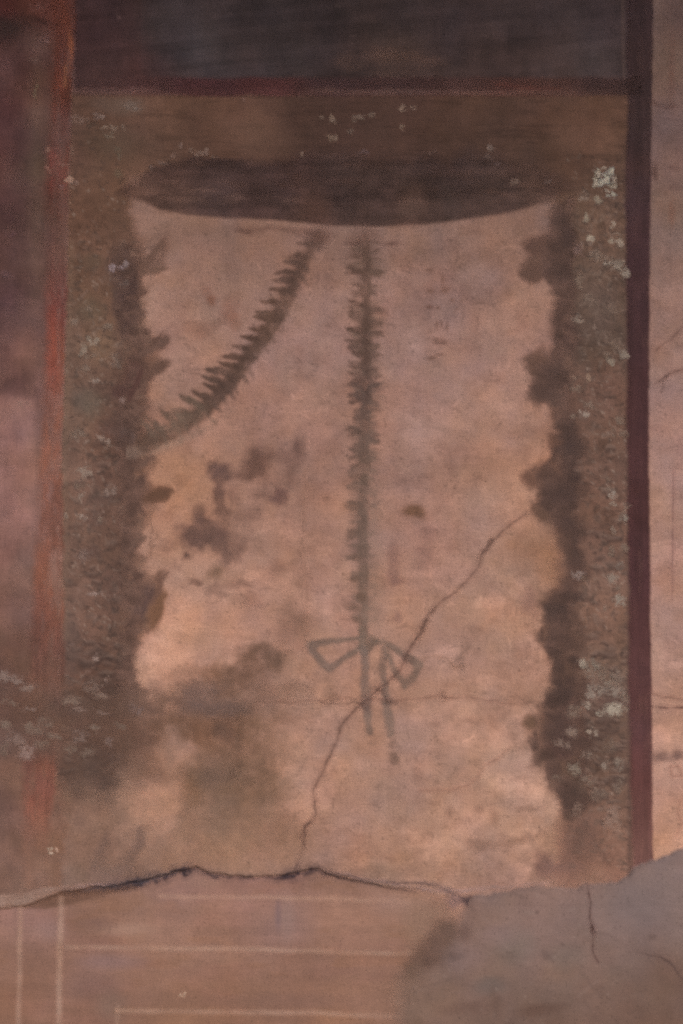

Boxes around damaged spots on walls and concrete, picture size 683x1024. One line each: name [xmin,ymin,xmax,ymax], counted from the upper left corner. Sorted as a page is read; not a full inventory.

crack [49,867,217,898]
crack [278,868,346,879]